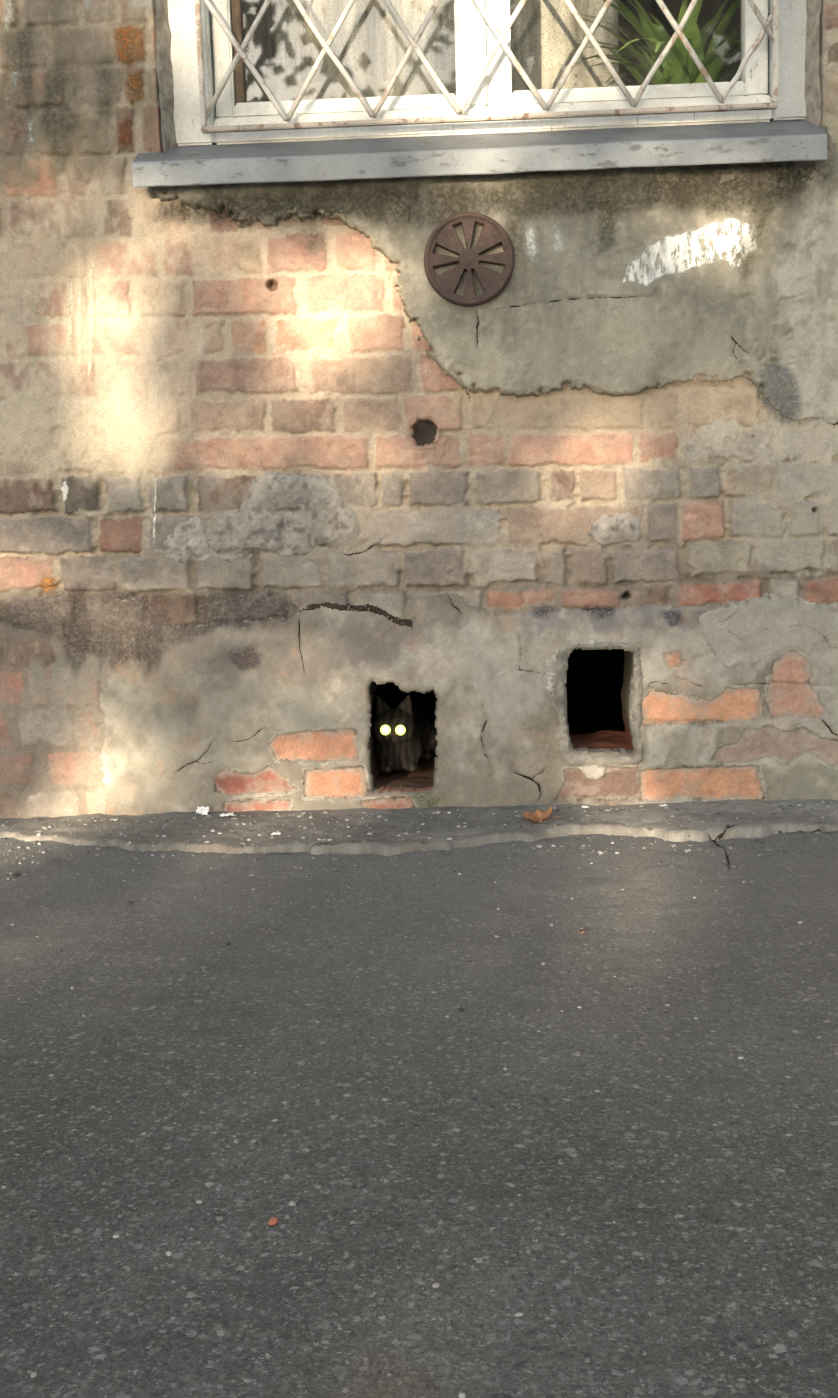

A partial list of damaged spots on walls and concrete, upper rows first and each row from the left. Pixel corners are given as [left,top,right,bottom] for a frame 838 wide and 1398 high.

crack [476,296,648,346]
crack [298,602,413,672]
flaking render [556,593,838,804]
crack [177,729,266,772]
spalling [211,726,417,812]
crack [701,825,735,870]